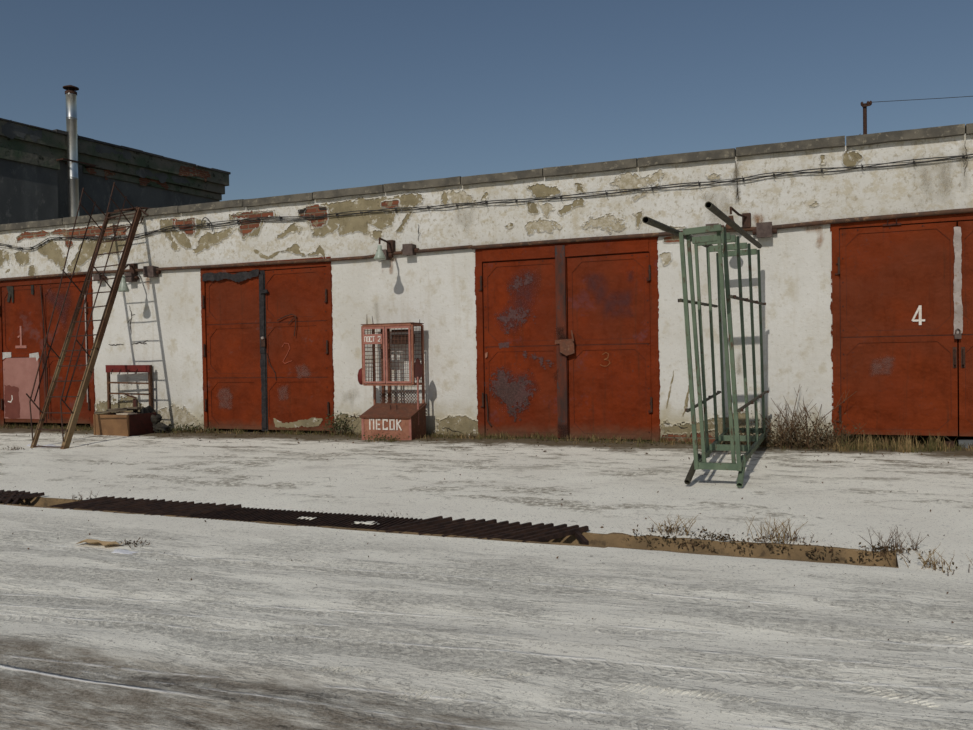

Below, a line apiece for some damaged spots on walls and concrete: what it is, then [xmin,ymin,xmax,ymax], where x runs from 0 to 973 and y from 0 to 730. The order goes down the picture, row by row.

flaking render [0,223,128,276]
peeling [159,192,425,259]
peeling [440,188,490,207]
peeling [505,168,666,237]
peeling [658,224,687,267]
peeling [497,269,542,349]
peeling [484,350,554,422]
peeling [273,417,323,429]
peeling [335,412,362,435]